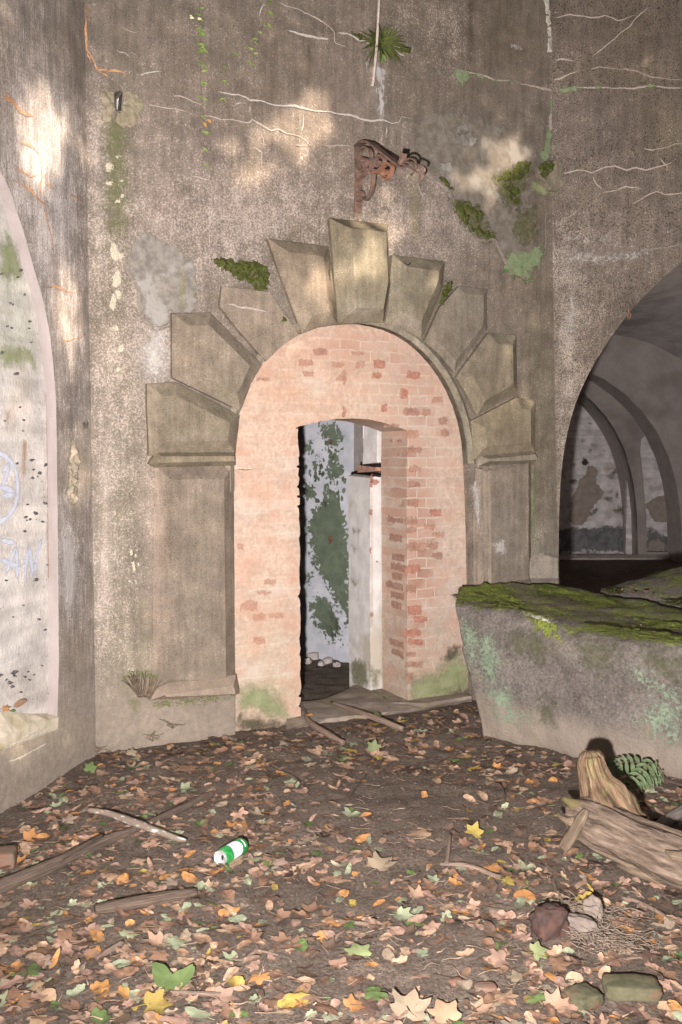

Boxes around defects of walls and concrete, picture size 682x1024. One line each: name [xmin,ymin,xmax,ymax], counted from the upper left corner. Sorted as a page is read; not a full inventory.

crack [84,20,408,165]
crack [259,1,370,47]
crack [455,8,681,131]
crack [563,143,681,215]
spalling [125,232,202,330]
peeling [384,371,449,453]
peeling [299,407,349,646]
peeling [559,459,624,554]